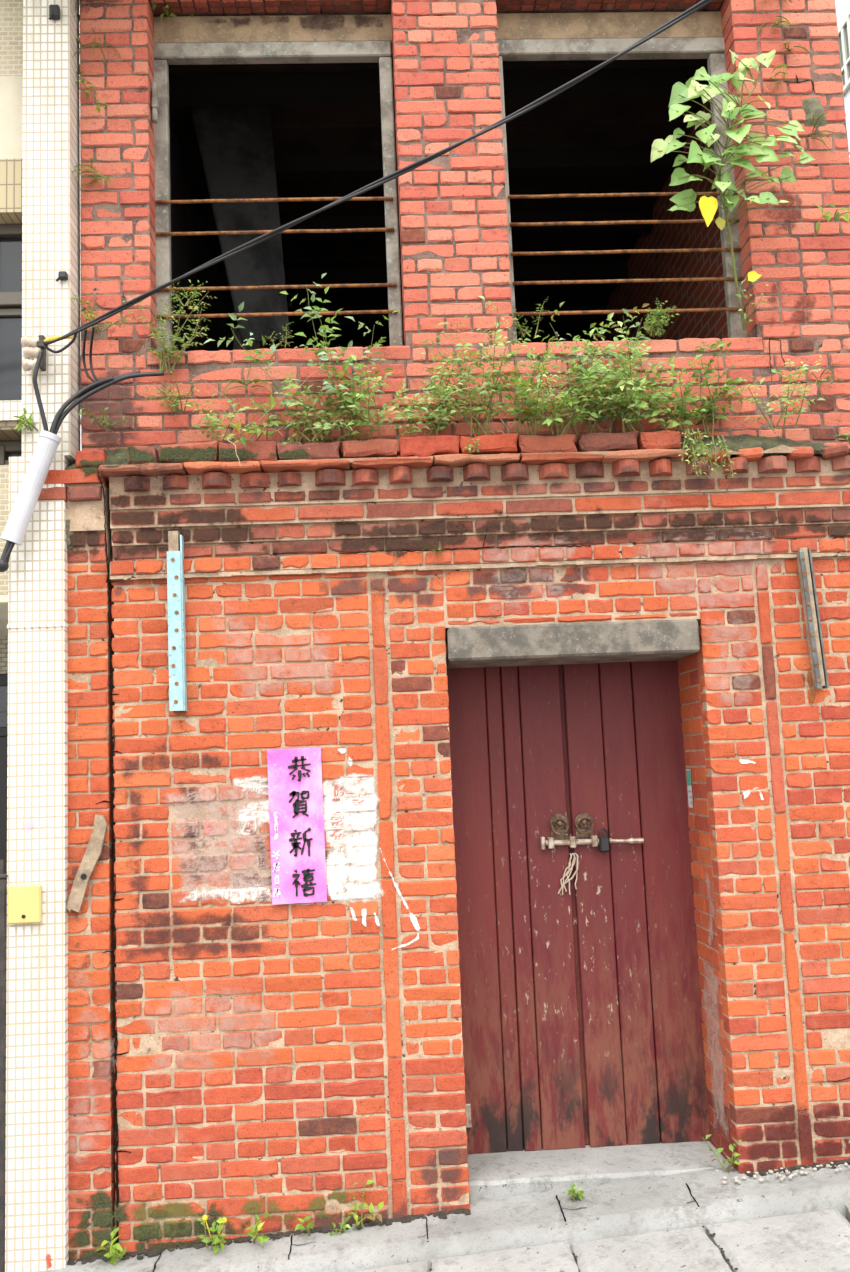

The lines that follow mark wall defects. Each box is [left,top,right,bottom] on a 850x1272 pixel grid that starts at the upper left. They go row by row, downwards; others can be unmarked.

damp [655,512,850,545]
peeling [233,776,270,836]
crack [96,471,131,1250]
peeling [182,883,272,904]
damp [423,1150,462,1214]
damp [316,1208,413,1227]